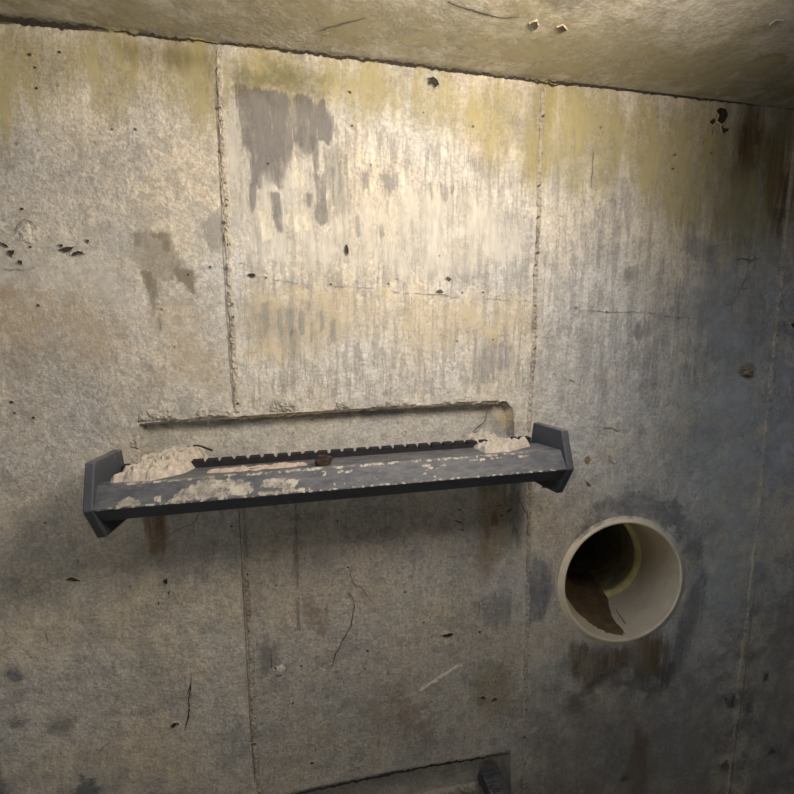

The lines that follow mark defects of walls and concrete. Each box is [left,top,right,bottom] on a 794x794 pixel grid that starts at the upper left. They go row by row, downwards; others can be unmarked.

crack [0,14,791,109]
water stain [236,86,331,232]
water stain [135,232,196,310]
crack [332,569,374,667]
crack [184,675,192,731]